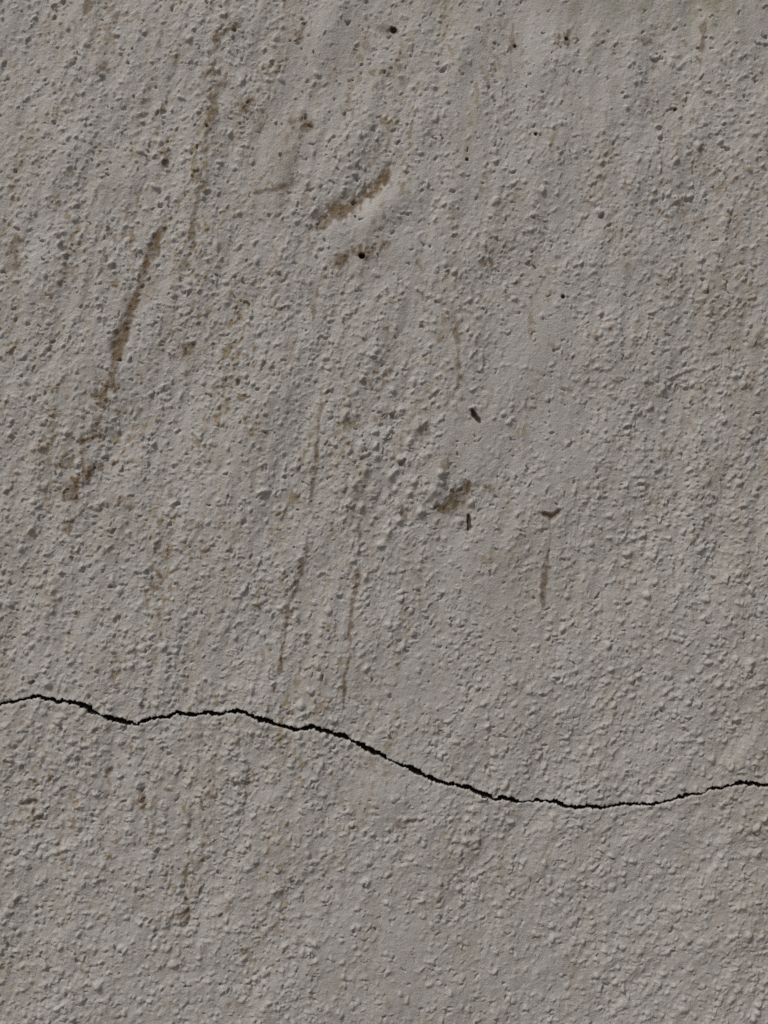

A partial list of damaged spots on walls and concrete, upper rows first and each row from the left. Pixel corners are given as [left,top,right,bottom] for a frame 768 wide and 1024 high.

crack [0,689,768,816]